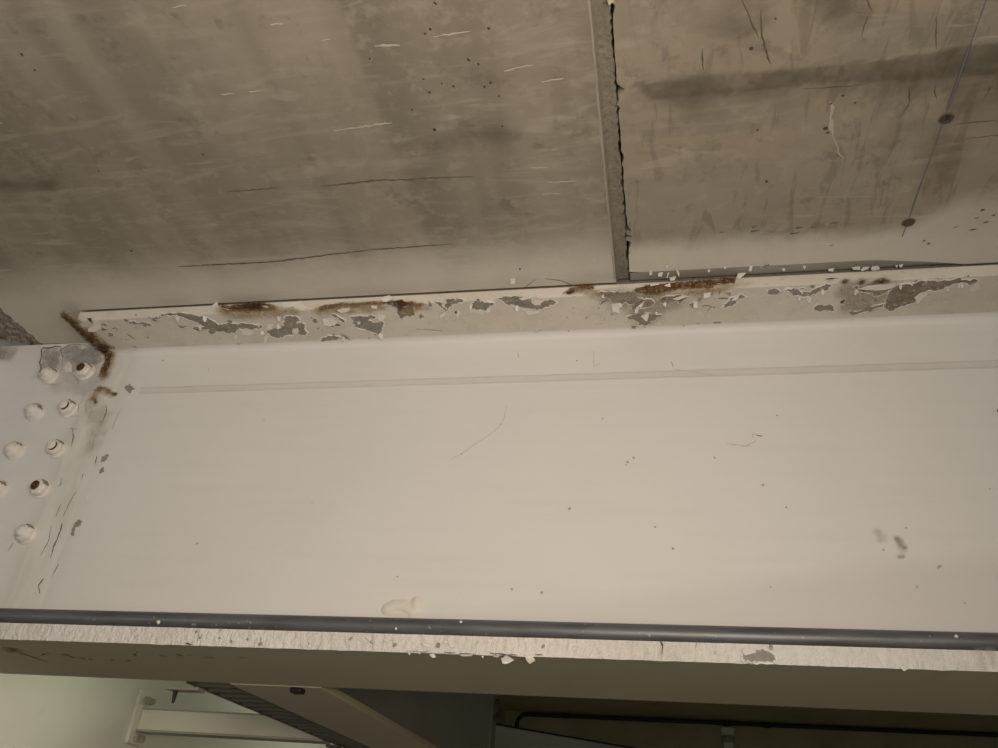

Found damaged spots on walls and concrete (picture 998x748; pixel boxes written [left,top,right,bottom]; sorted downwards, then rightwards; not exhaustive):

rust [211,295,424,320]
peeling [418,268,559,319]
peeling [596,289,747,329]
rust [634,278,735,296]
peeling [766,268,980,322]
rust [61,312,117,403]